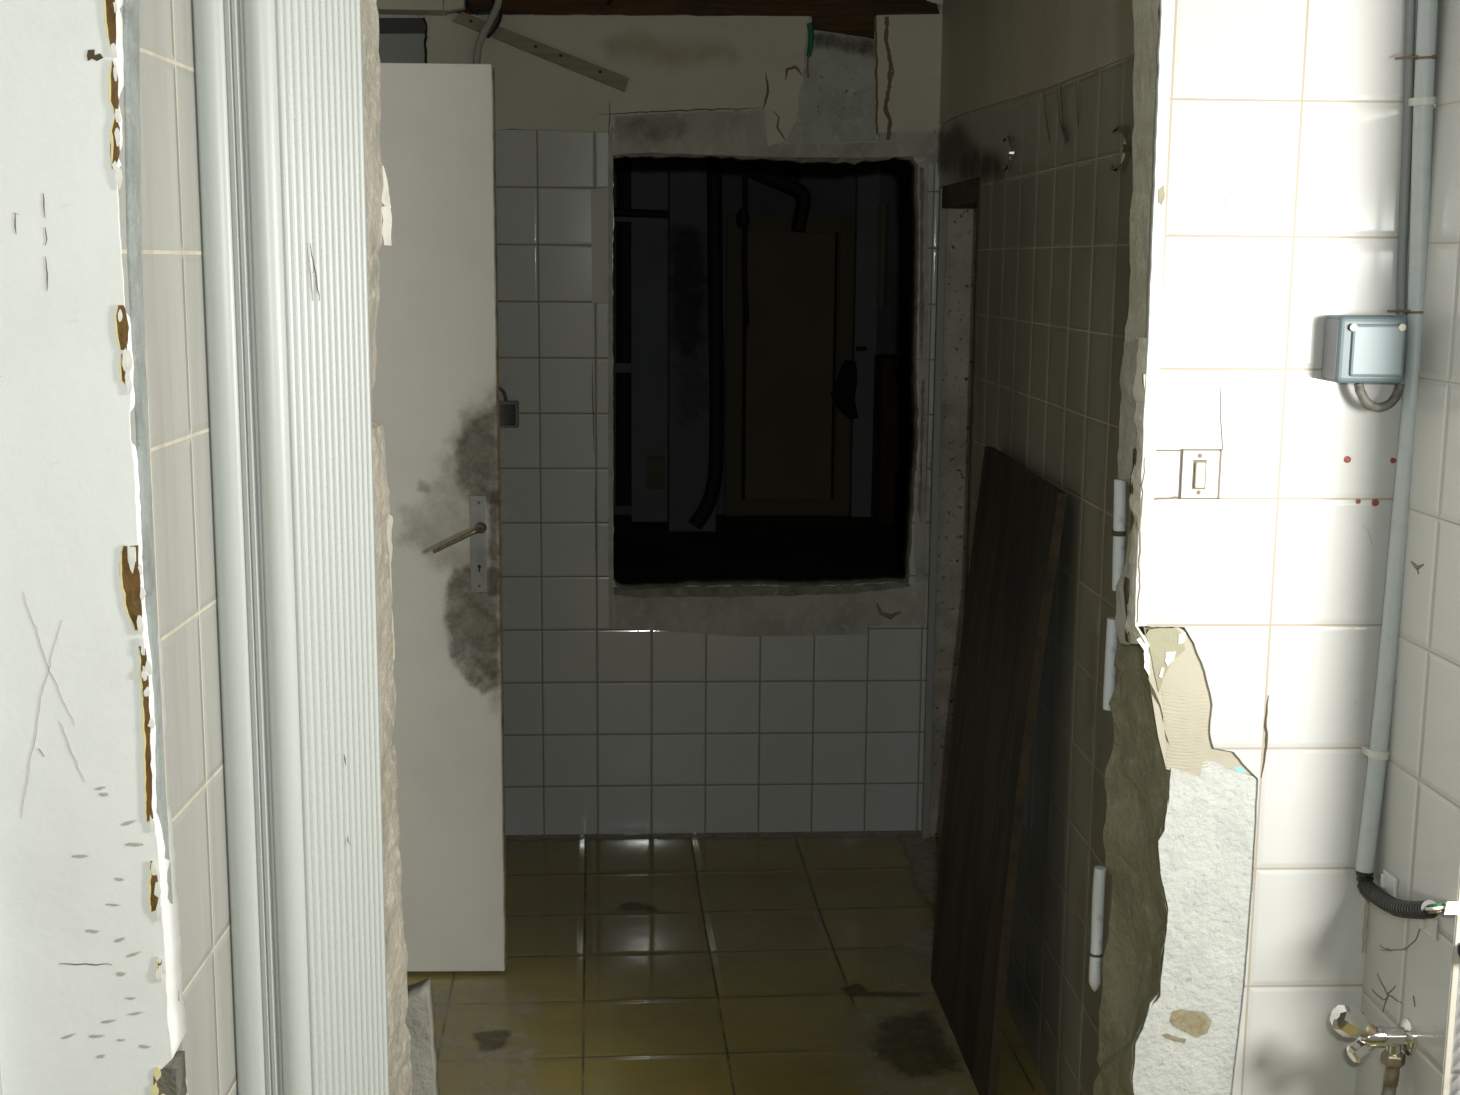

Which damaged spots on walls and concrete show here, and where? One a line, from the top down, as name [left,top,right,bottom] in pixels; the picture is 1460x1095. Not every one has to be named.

flaking render [613,31,913,166]
crack [874,16,894,140]
peeling [1093,338,1257,1095]